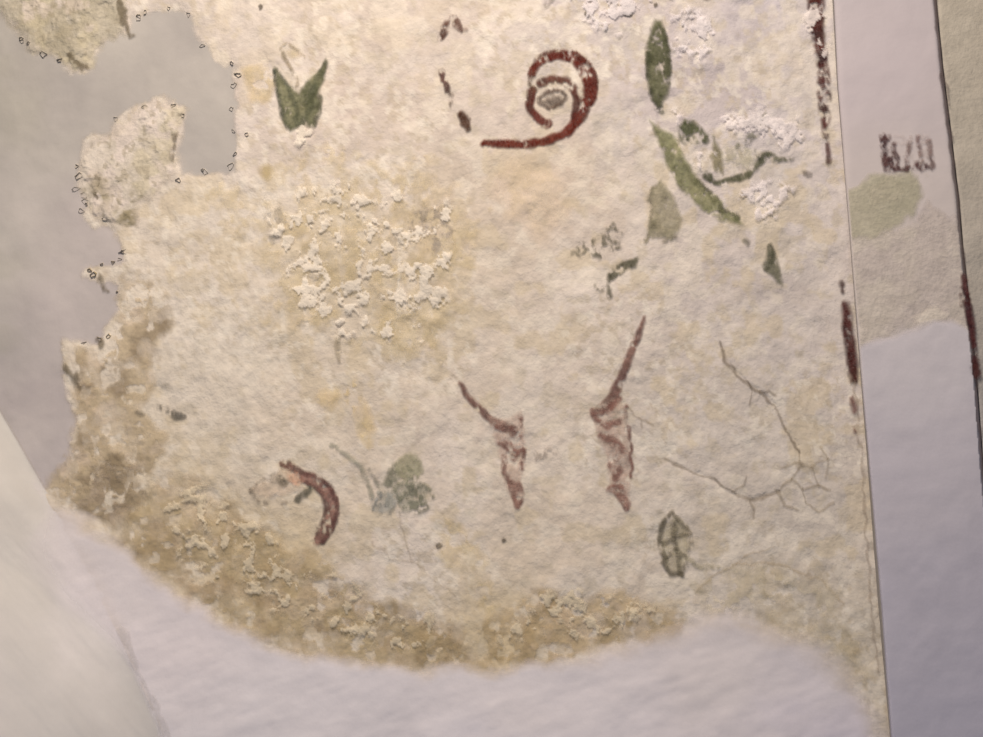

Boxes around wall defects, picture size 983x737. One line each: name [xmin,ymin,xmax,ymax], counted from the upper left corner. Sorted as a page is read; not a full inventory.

spalling [0,0,249,487]
water stain [52,298,461,667]
water stain [478,592,639,666]